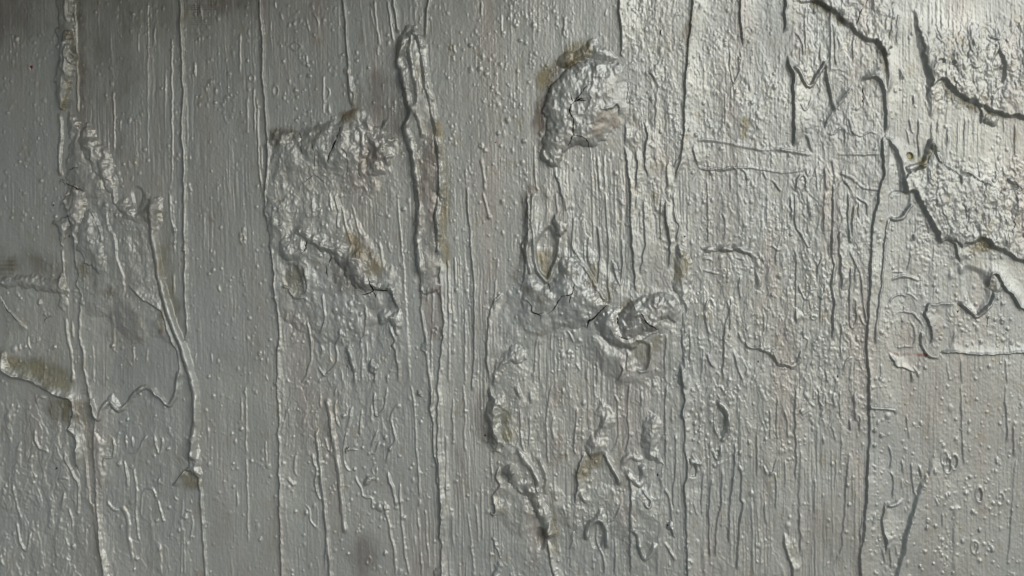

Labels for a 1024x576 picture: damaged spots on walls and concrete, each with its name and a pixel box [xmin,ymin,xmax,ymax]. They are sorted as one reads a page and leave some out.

peeling [71,208,198,576]
peeling [782,0,1024,576]